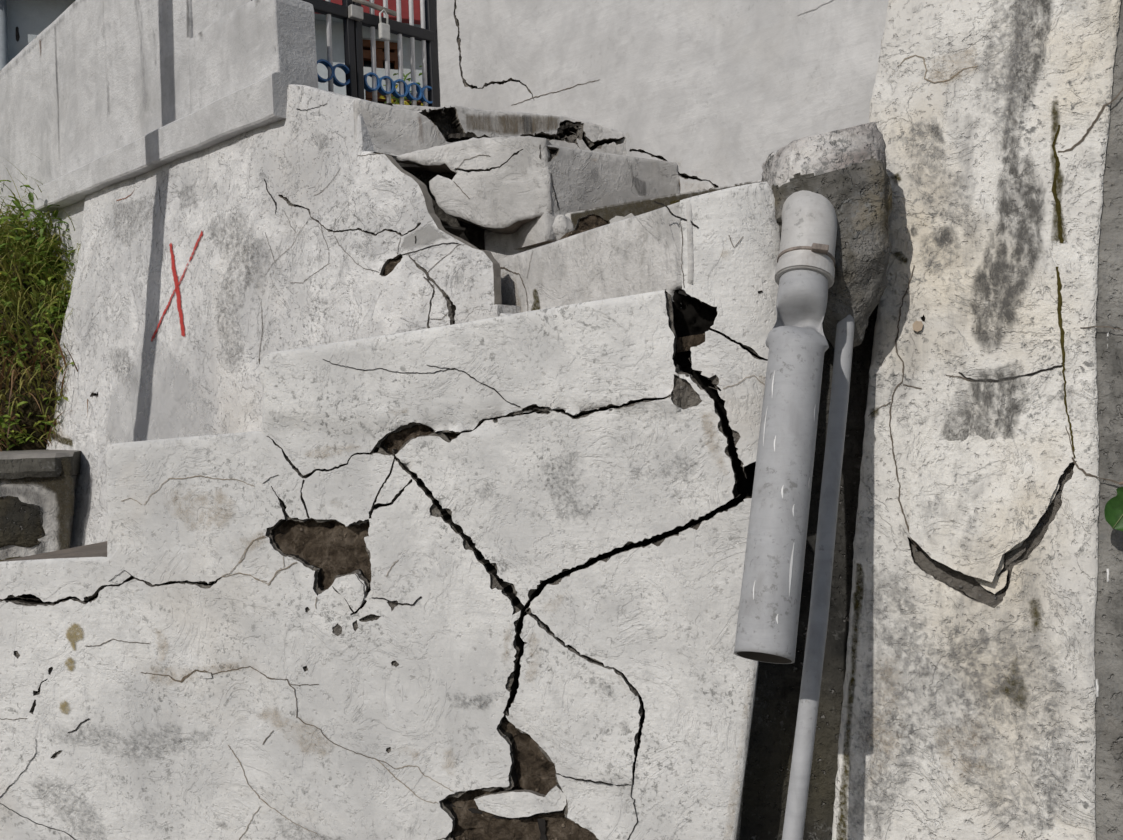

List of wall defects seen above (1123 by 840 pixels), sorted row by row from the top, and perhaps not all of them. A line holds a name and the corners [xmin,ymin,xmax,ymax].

crack [264,153,461,325]
flaking render [417,107,457,141]
crack [447,122,719,288]
flaking render [560,213,635,240]
water stain [971,0,1050,346]
flaking render [665,289,718,410]
water stain [943,371,1020,441]
crack [946,363,1065,382]
crack [2,536,297,606]
flaking render [268,516,398,636]
crack [323,328,768,840]
flaking render [441,705,599,840]